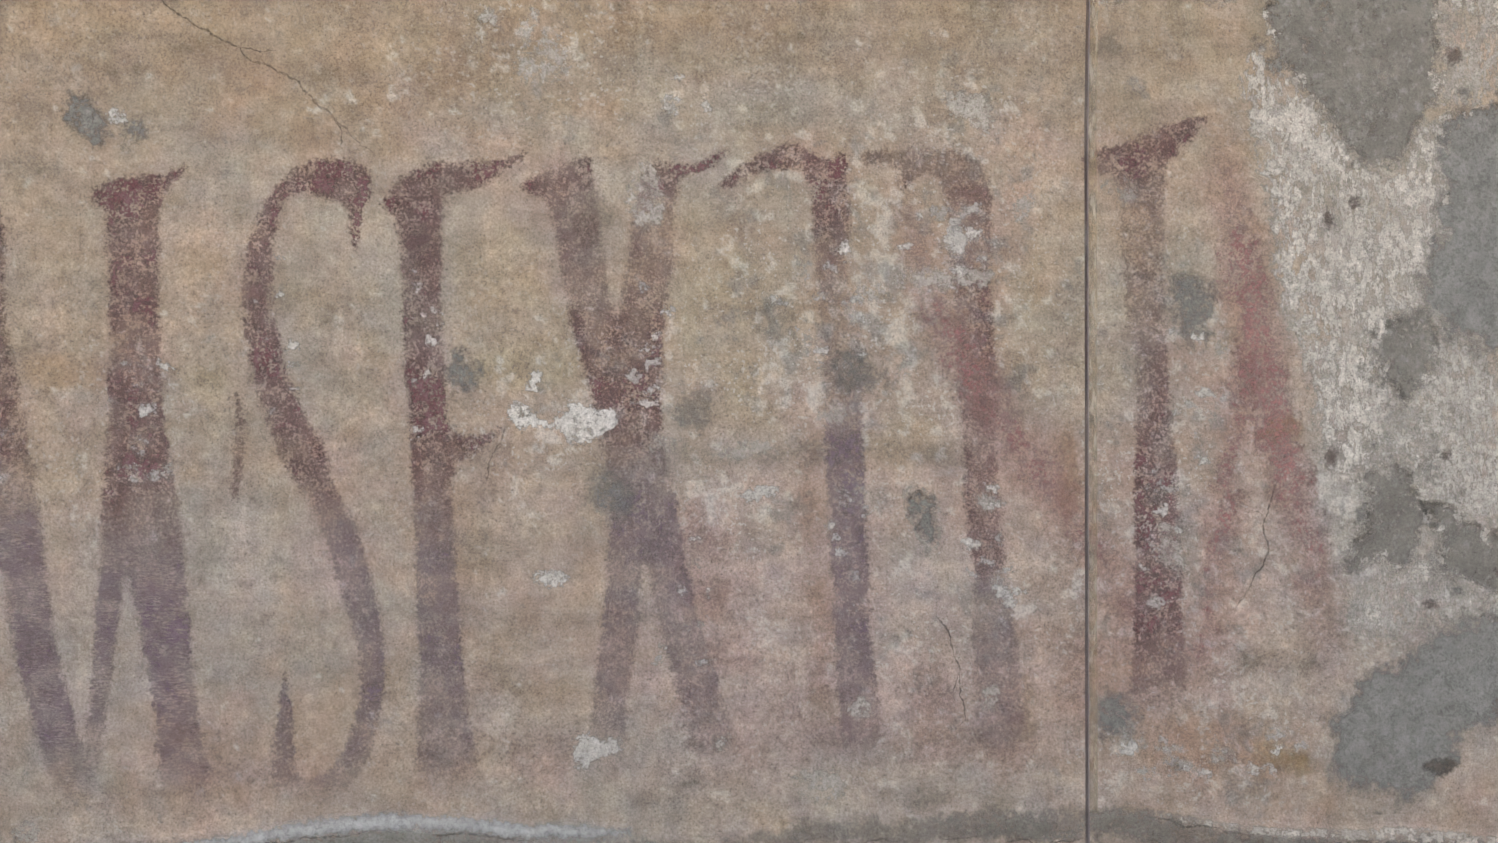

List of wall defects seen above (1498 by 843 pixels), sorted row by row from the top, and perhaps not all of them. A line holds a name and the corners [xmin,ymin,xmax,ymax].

peeling [1239,0,1498,595]
peeling [507,370,618,444]
crack [1248,506,1270,590]
spalling [1329,613,1498,801]